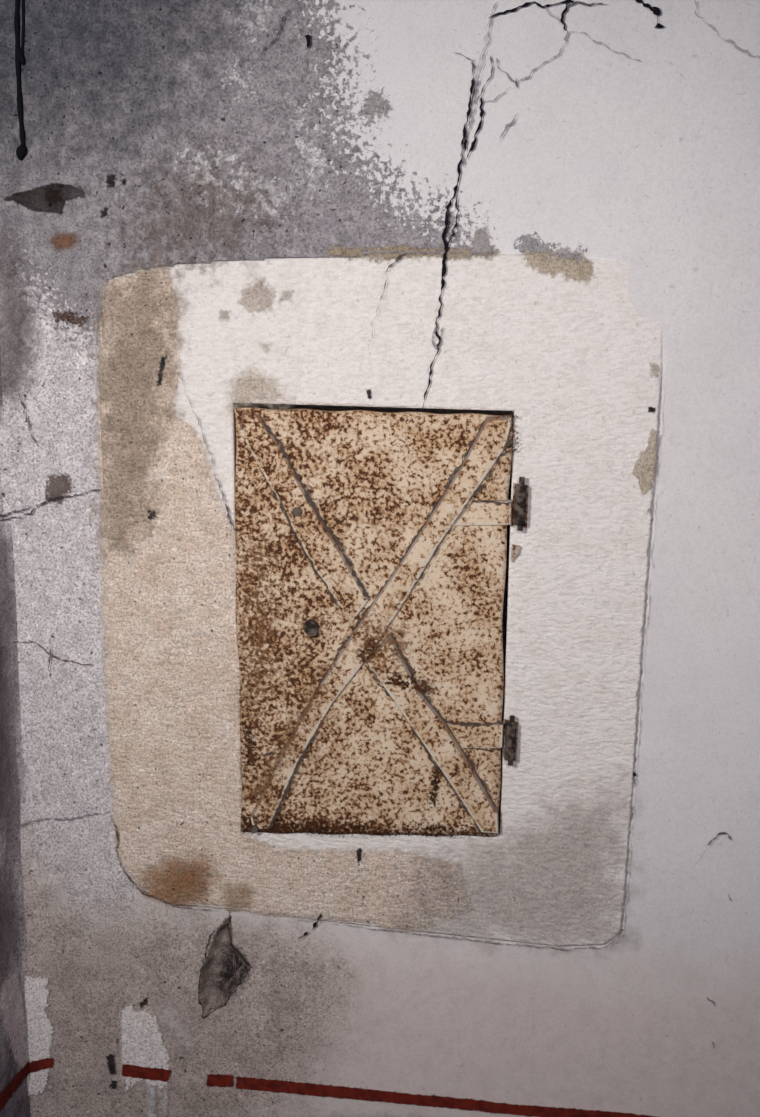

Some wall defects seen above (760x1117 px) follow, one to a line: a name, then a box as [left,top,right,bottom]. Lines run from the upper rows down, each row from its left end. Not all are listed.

crack [635,0,664,28]
crack [694,0,760,58]
water stain [358,86,391,126]
crack [422,0,642,411]
water stain [327,228,498,262]
water stain [514,231,593,284]
water stain [239,280,291,312]
crack [368,253,407,346]
corrosion [502,411,519,454]
peeling [0,0,495,1019]
corrosion [235,534,495,838]
flaking render [106,1053,117,1089]